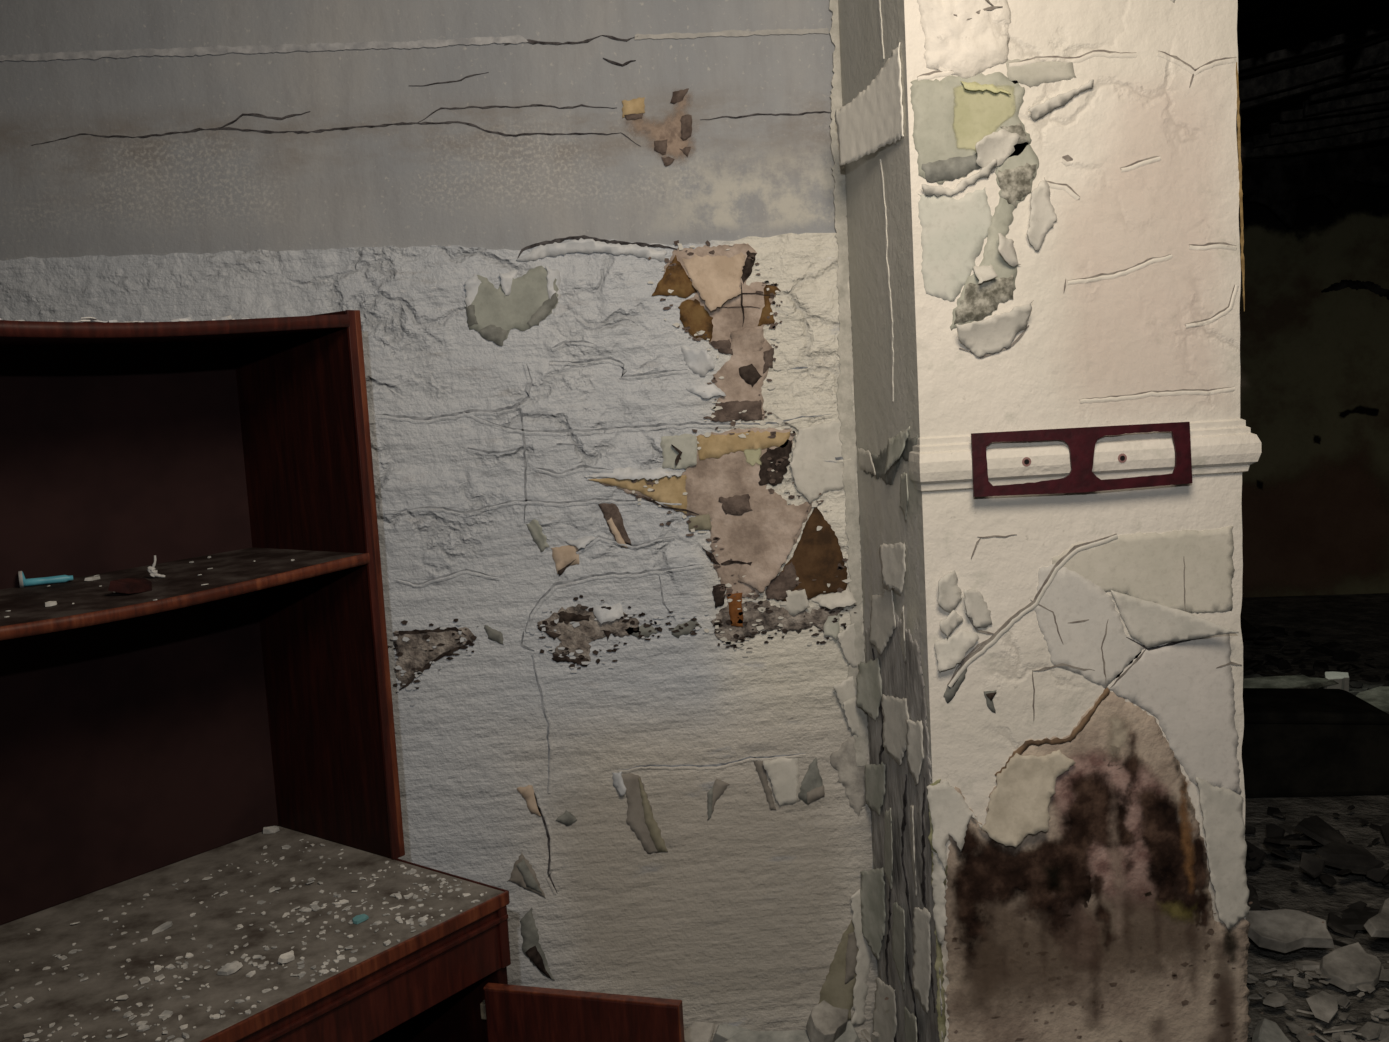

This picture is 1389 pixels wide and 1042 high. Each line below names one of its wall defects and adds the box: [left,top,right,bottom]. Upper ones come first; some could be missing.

crack [31,35,640,146]
crack [700,111,831,120]
crack [516,235,678,262]
peeling [835,0,1094,401]
peeling [464,265,561,346]
crack [820,456,851,464]
spalling [388,619,504,706]
crack [376,340,832,895]
spalling [517,240,1262,1042]
peeling [508,853,555,981]
damp [955,734,1209,995]
damp [1225,932,1237,959]